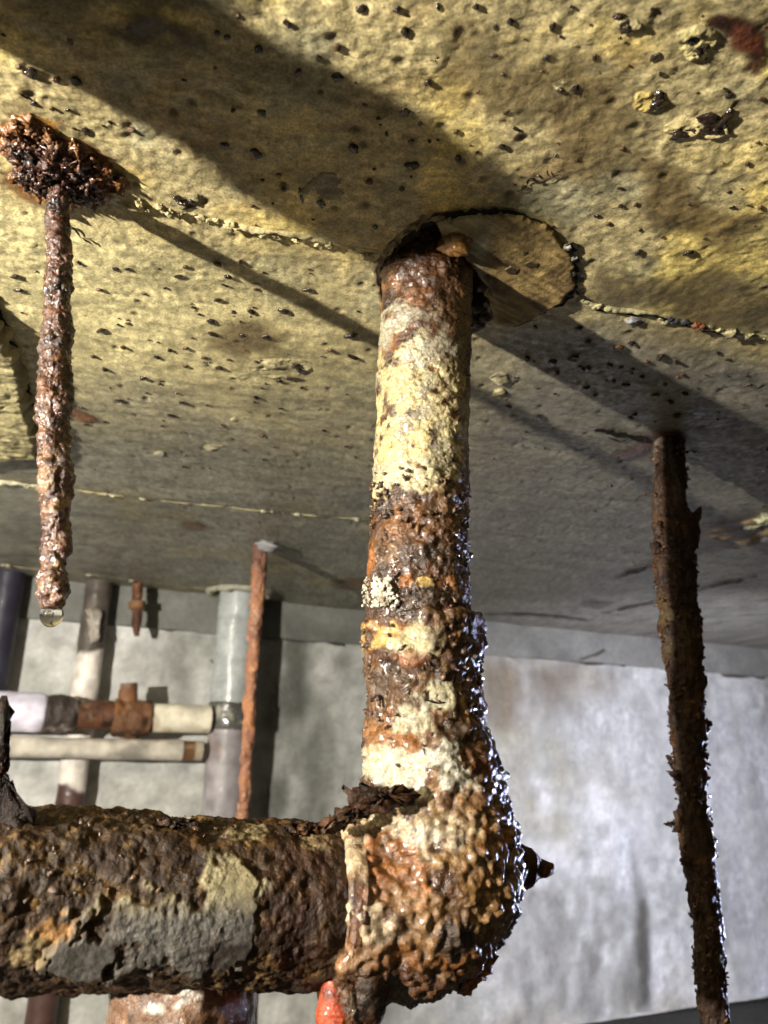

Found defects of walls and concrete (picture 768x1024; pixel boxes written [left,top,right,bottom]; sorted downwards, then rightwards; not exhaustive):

rust [705,15,764,73]
spalling [471,269,493,333]
rust [691,506,768,554]
rust [333,580,365,590]
rust [665,755,681,782]
rust [148,816,202,830]
rust [283,782,422,838]
rust [663,805,684,833]
rust [679,856,693,868]
rust [457,955,499,996]